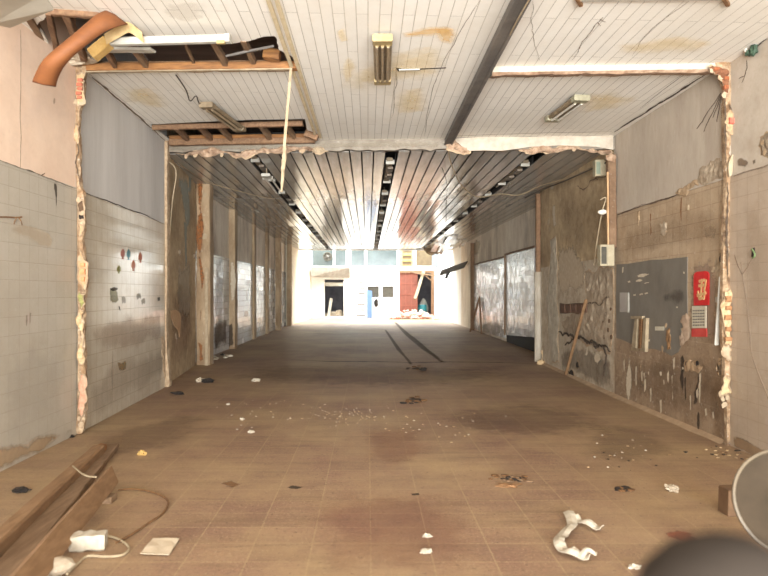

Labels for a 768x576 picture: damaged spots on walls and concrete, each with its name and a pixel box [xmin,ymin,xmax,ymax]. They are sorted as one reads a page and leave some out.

spalling [74,72,86,106]
flaking render [676,154,733,197]
spalling [76,197,86,237]
spalling [77,250,88,291]
crack [558,331,610,376]
peeling [659,313,703,398]
spalling [716,289,732,408]